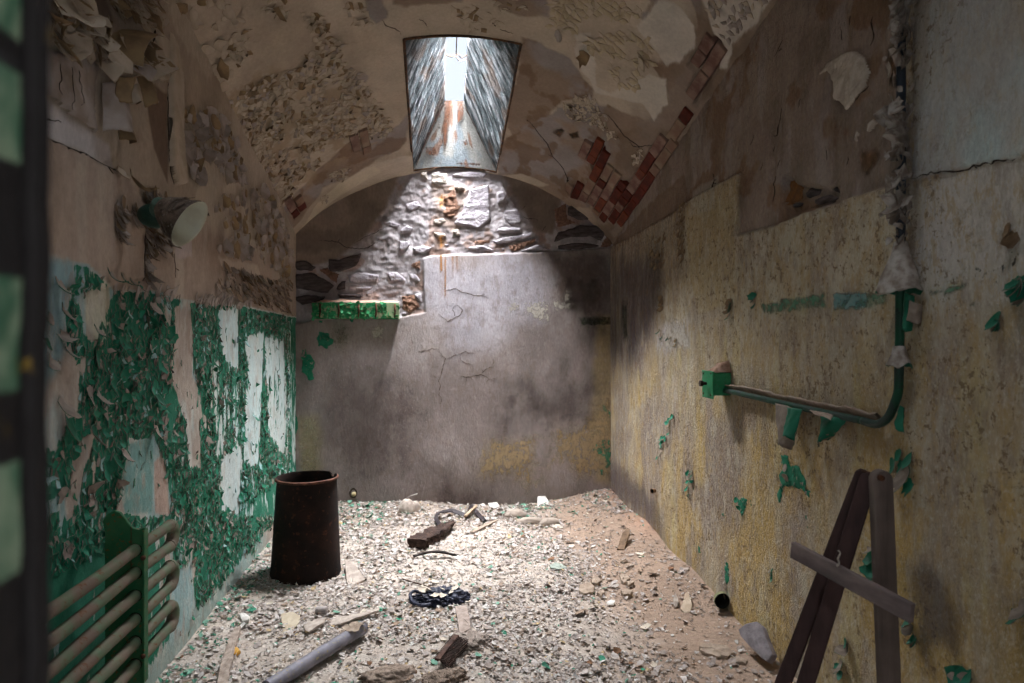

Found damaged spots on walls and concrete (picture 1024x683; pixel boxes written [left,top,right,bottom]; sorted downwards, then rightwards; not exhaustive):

flaking render [560,0,768,227]
peeling [879,0,919,246]
crack [914,158,1017,179]
peeling [47,0,400,636]
crack [421,348,497,410]